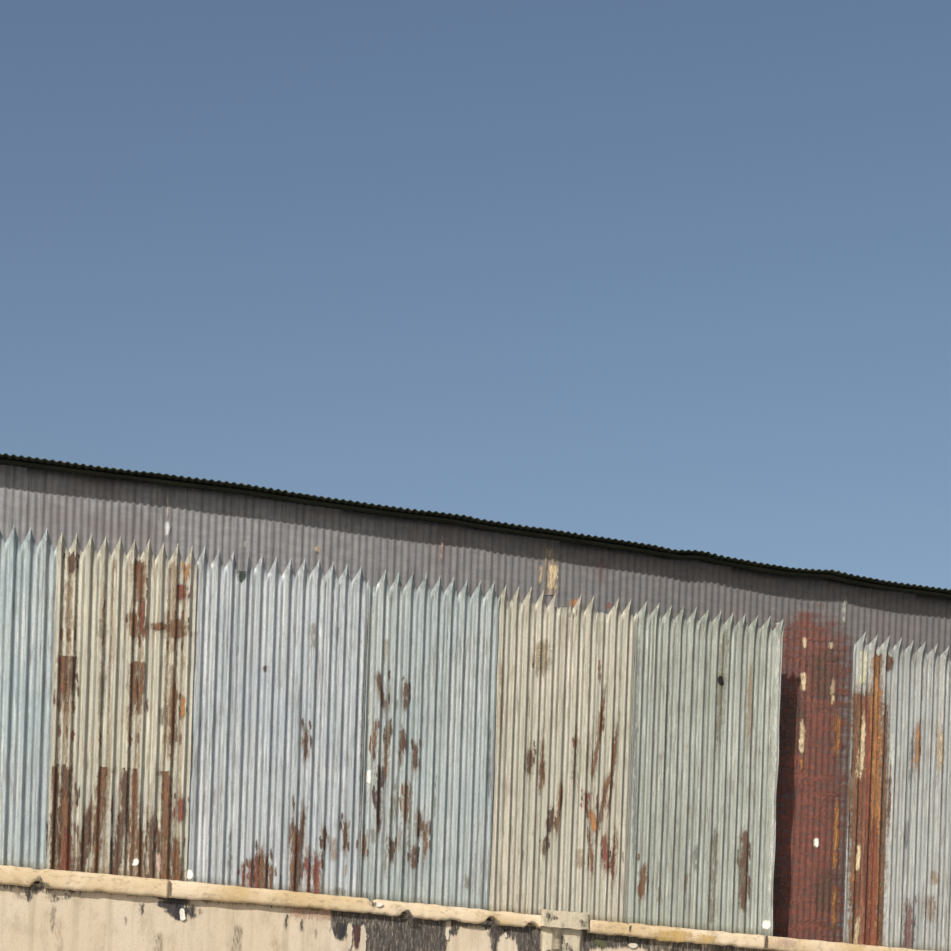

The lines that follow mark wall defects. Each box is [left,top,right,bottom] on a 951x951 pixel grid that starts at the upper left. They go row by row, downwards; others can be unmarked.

rust [46,551,192,881]
rust [227,670,437,894]
rust [524,740,545,791]
rust [539,698,623,878]
rust [772,604,892,946]
rust [637,854,649,898]
rust [737,831,751,909]
peeling [291,901,541,951]
peeling [582,931,775,951]